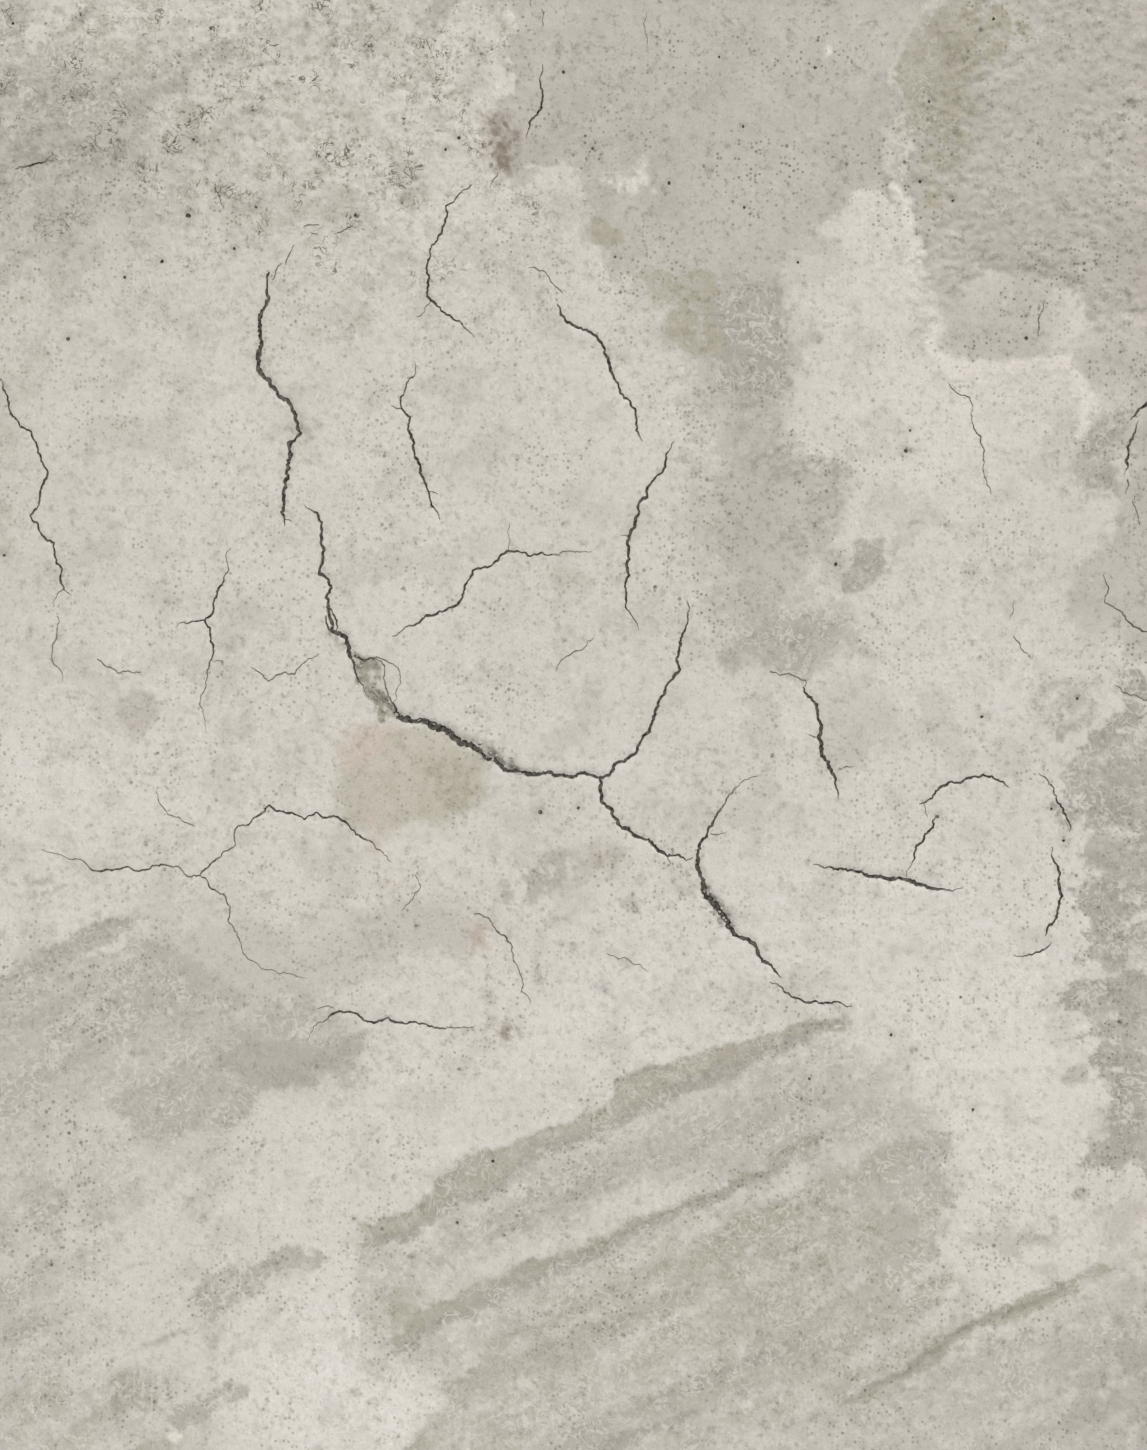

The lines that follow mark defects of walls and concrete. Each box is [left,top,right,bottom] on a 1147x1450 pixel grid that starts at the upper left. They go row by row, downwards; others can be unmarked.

crack [420,173,498,335]
crack [0,378,70,681]
crack [180,224,852,1007]
water stain [0,912,152,995]
crack [50,804,421,978]
crack [813,773,1008,891]
crack [1014,775,1071,957]
water stain [212,1030,379,1092]
water stain [347,1011,962,1400]
water stain [139,1243,327,1421]
water stain [531,1332,816,1450]
water stain [841,1189,1147,1408]